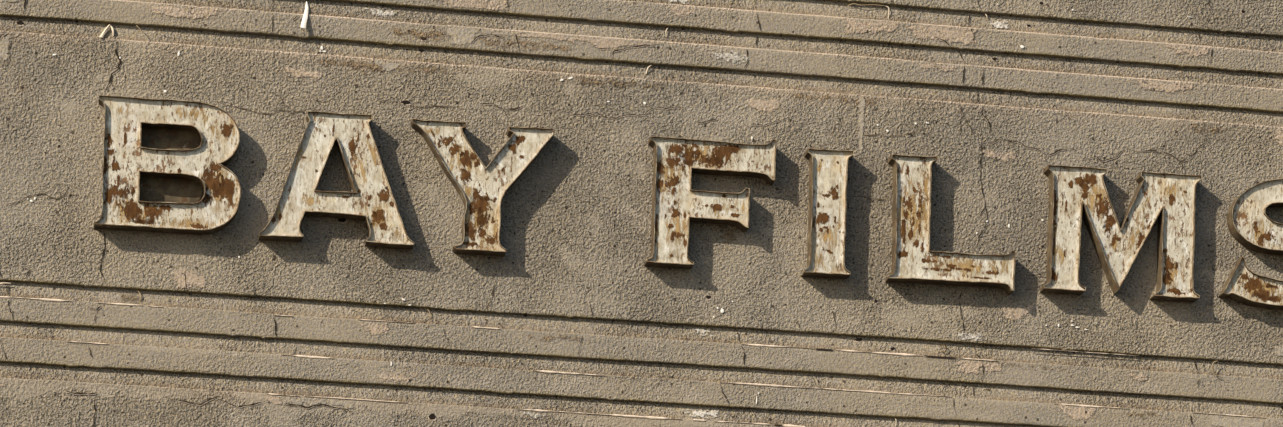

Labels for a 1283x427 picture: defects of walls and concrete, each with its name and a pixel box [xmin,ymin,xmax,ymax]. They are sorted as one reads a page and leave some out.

crack [106,28,122,92]
corrosion [103,103,235,229]
corrosion [342,131,402,240]
corrosion [425,128,498,250]
crack [441,0,519,51]
crack [379,100,717,124]
crack [593,45,654,57]
crack [745,0,761,68]
corrosion [812,159,841,270]
corrosion [897,166,1008,279]
crack [935,0,1209,249]
corrosion [1051,173,1151,285]